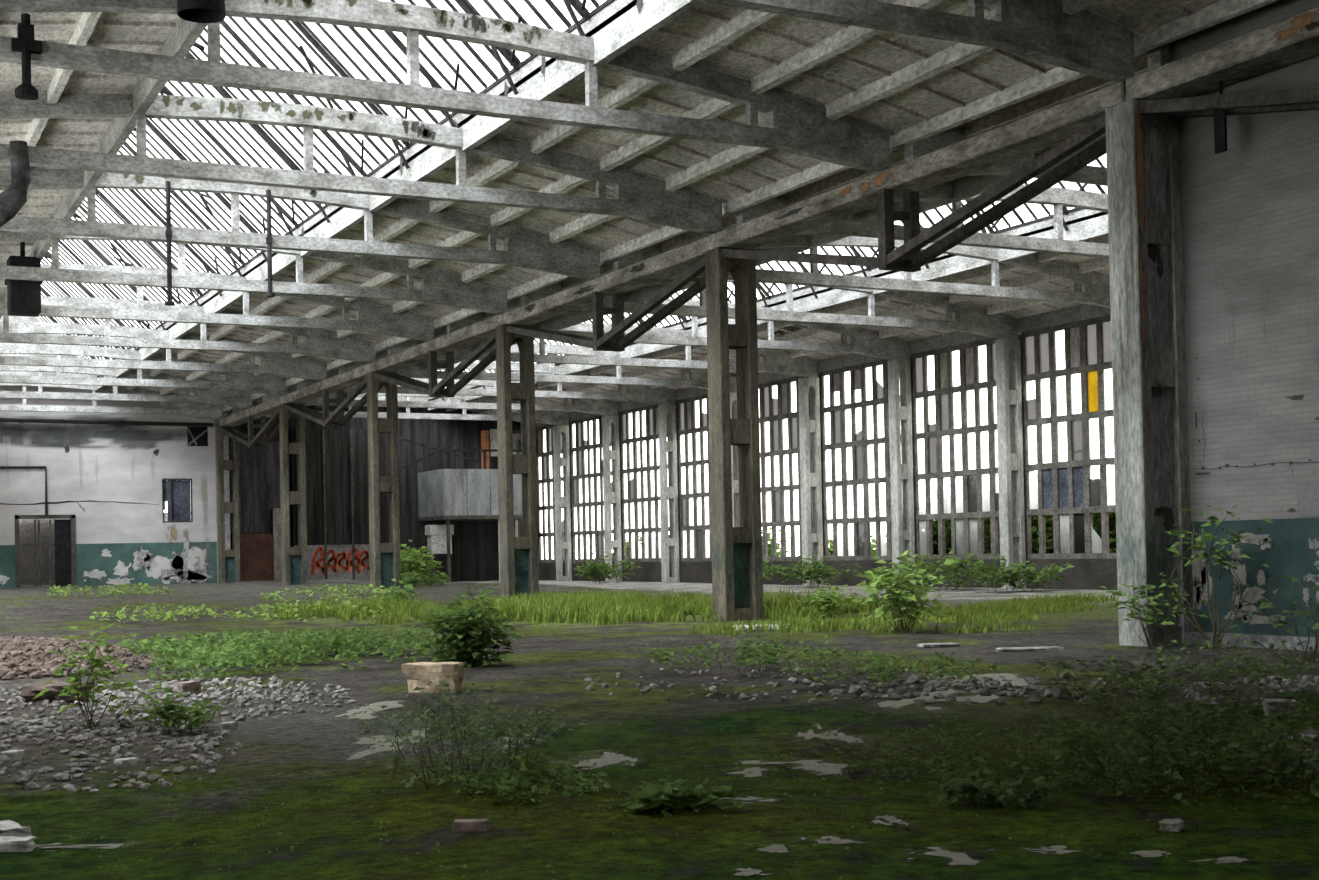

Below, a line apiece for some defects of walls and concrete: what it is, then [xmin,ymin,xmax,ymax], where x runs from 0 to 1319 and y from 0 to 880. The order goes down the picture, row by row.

peeling [83,541,213,585]
peeling [1224,532,1286,625]
peeling [1303,539,1319,605]